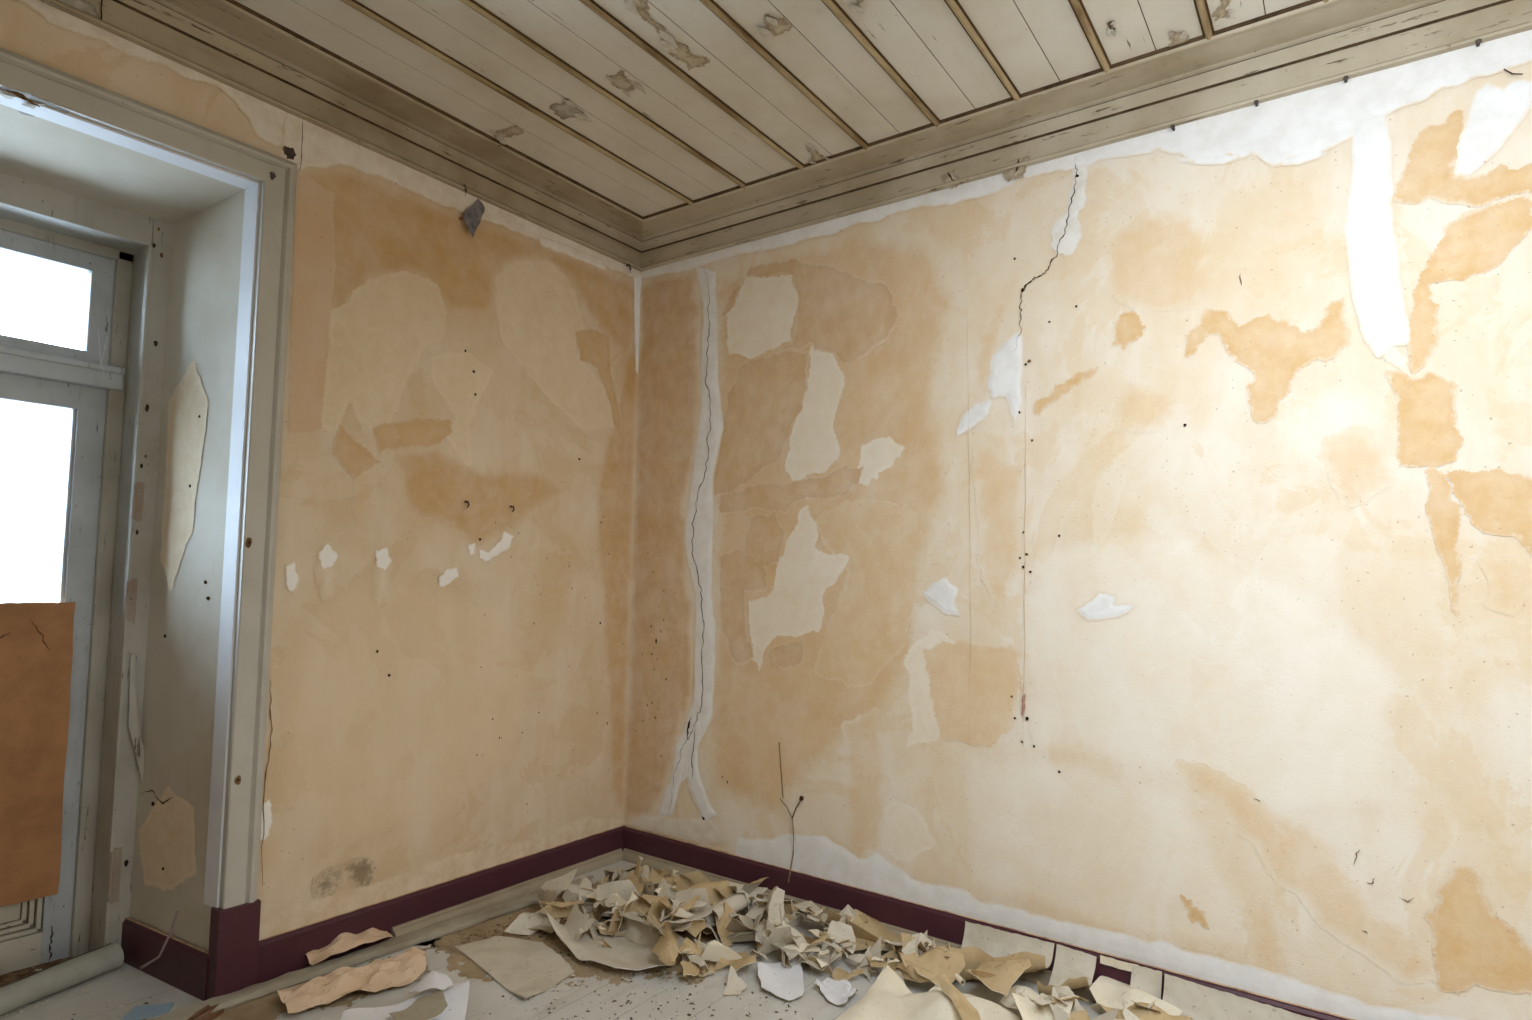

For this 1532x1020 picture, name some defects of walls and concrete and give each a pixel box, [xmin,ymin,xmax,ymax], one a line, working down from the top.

peeling [0,86,69,117]
flaking render [17,0,1532,280]
crack [1013,165,1079,352]
crack [628,267,731,845]
crack [1020,386,1028,713]
flaking render [734,832,1468,1020]